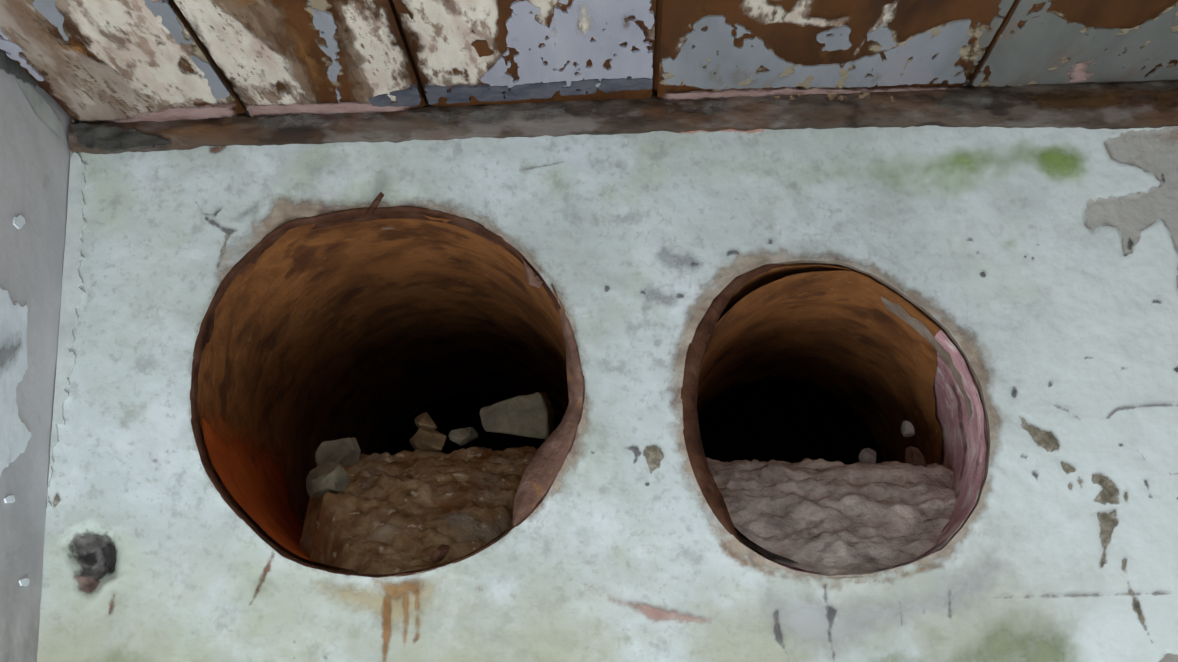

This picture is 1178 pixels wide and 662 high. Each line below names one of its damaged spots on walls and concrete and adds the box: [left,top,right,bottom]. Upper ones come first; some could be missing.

peeling [305,0,1178,122]
peeling [1085,126,1178,254]
peeling [0,0,323,509]
crack [1107,404,1171,419]
spalling [1019,417,1128,567]
spalling [70,533,116,593]
corrosion [339,582,432,662]
leakage [774,611,784,647]
leakage [824,586,836,638]
crack [1005,591,1166,599]
spalling [1129,589,1146,630]
peeling [1159,654,1178,662]